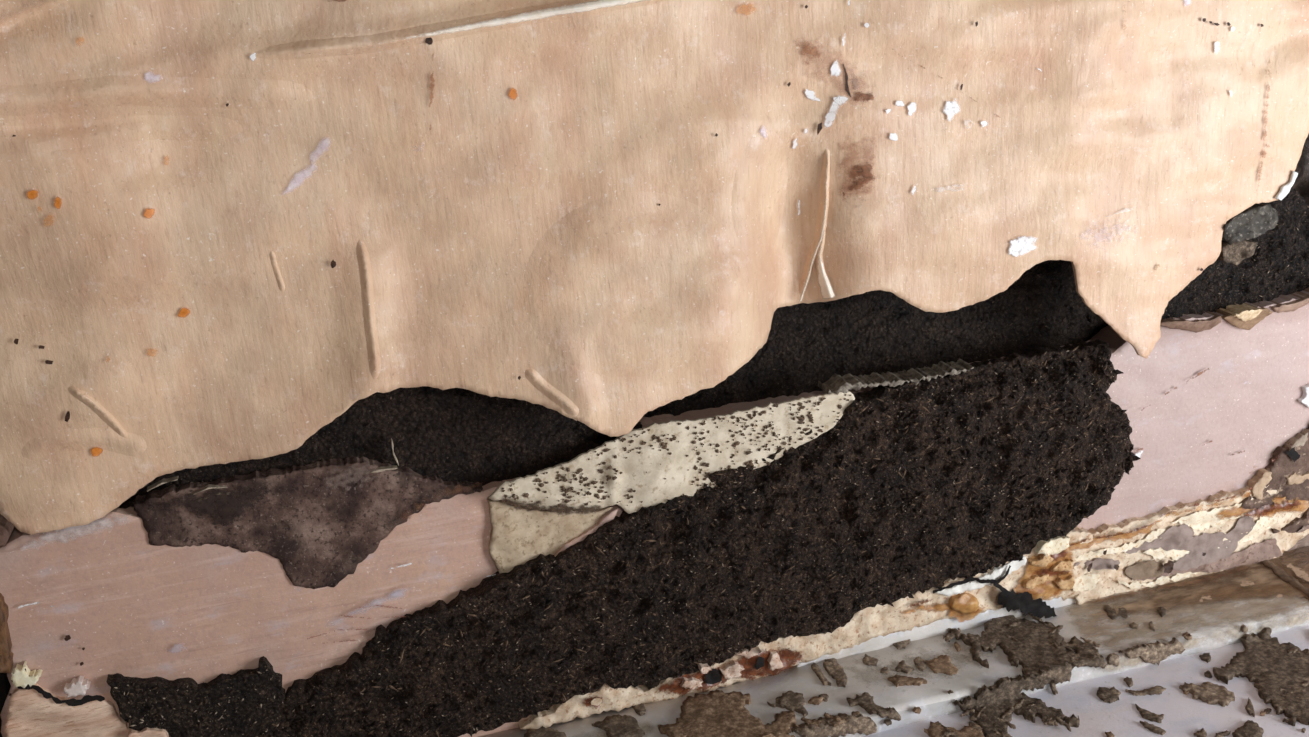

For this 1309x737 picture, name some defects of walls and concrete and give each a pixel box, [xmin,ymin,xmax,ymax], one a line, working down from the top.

spalling [1160,287,1309,333]
peeling [554,504,618,557]
flaking render [1041,425,1309,608]
flaking render [518,544,1045,737]
peeling [4,683,129,737]